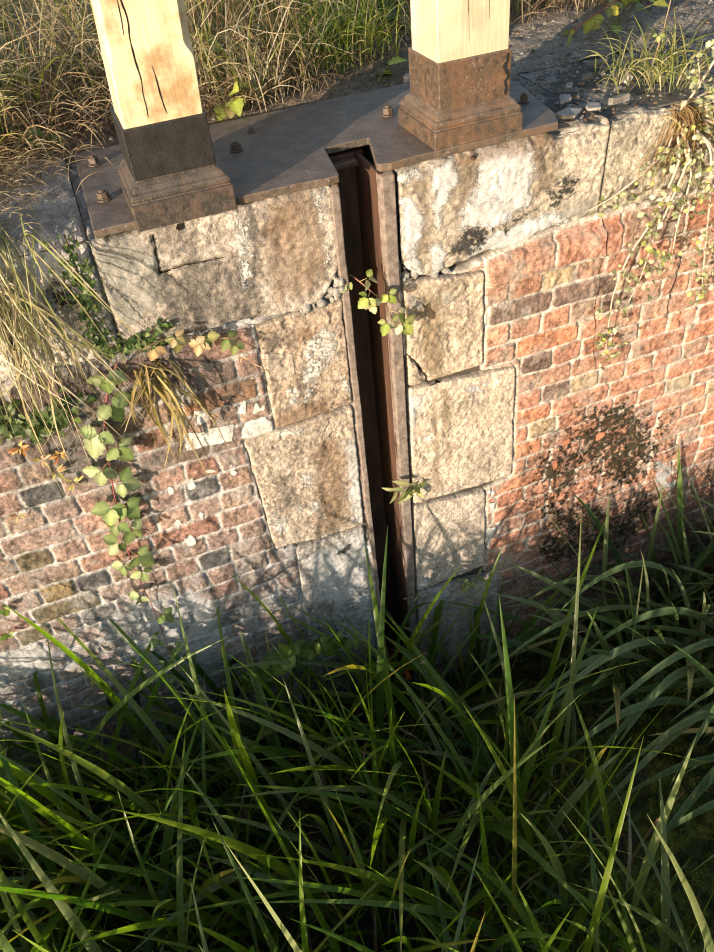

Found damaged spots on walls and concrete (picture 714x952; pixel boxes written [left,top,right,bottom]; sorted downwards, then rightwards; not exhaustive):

crack [117,0,167,116]